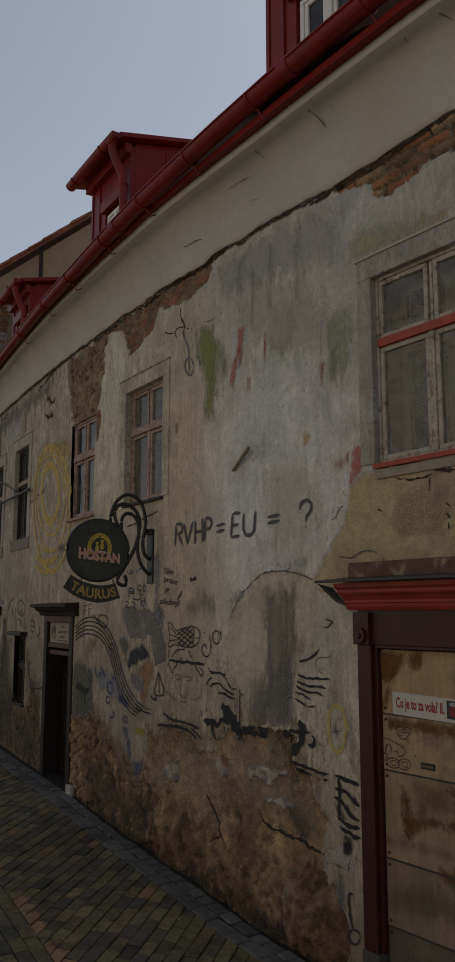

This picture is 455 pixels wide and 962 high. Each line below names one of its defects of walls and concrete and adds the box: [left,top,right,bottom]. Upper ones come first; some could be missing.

spalling [333,113,455,198]
flaking render [69,261,213,442]
flaking render [69,445,455,962]
crack [206,793,325,856]